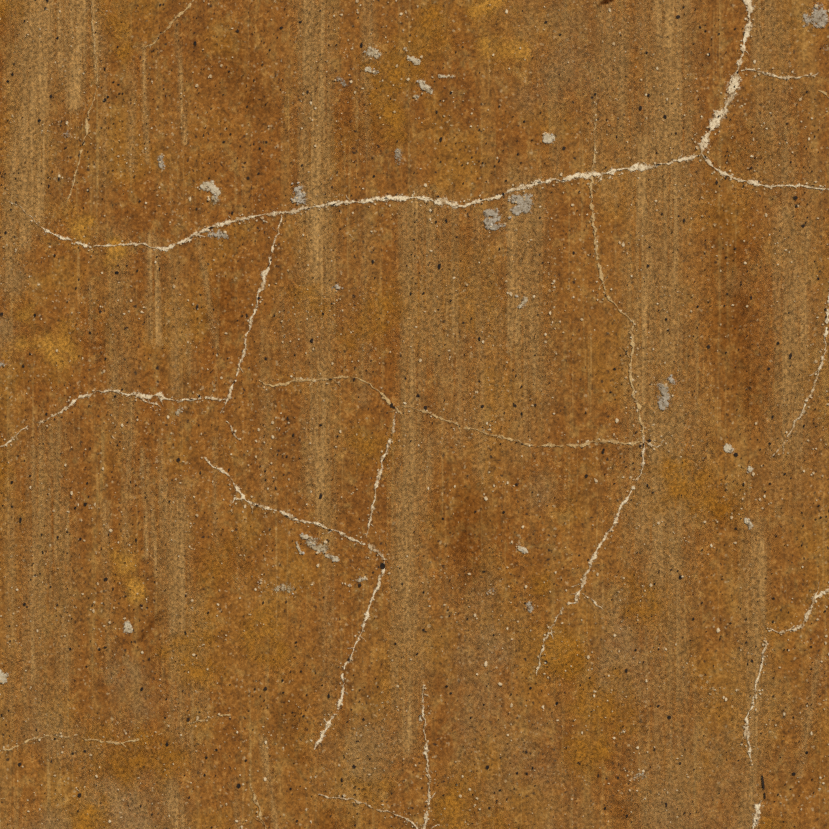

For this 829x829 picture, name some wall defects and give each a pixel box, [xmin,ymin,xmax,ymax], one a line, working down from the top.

crack [9,0,829,480]
crack [0,731,162,755]
corrosion [113,553,145,601]
crack [201,439,391,750]
crack [320,685,439,829]
corrosion [543,634,585,676]
crack [536,485,635,675]
crack [740,582,829,829]